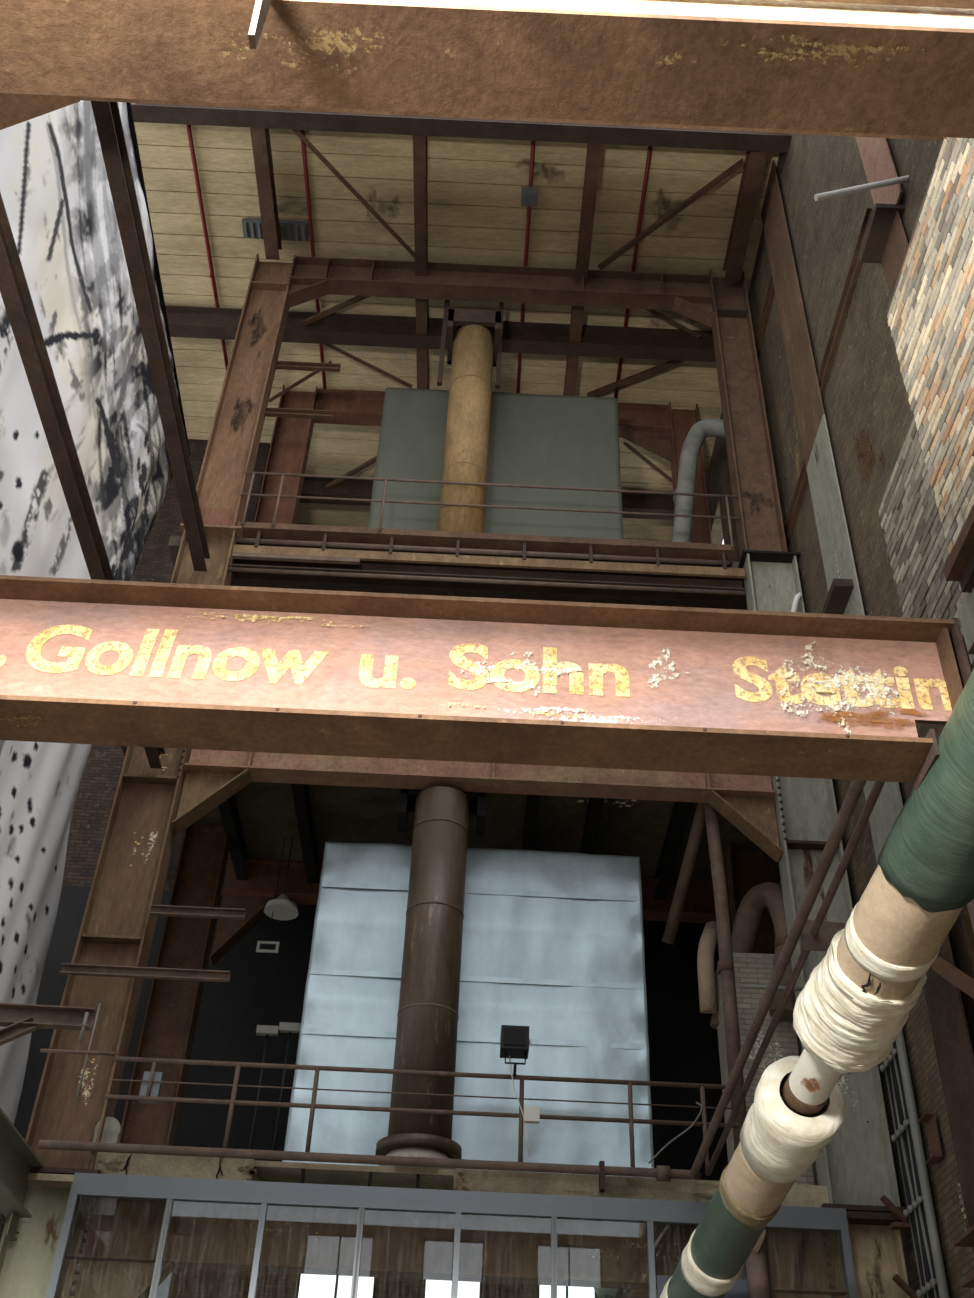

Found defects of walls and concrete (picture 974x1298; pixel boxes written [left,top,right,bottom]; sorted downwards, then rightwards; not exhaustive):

peeling [779,641,901,734]